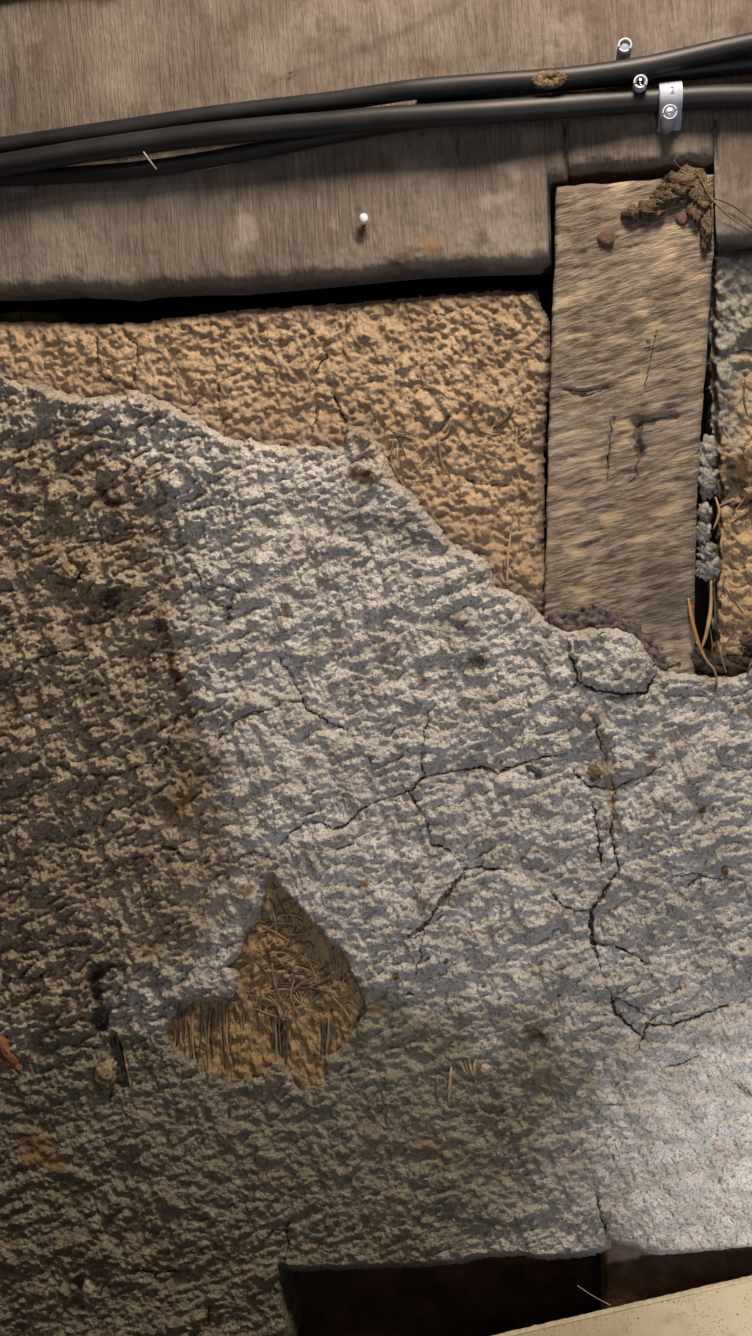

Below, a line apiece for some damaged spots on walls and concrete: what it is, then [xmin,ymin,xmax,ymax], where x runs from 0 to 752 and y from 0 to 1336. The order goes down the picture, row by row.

spalling [0,290,673,671]
spalling [704,250,752,657]
spalling [167,877,365,1091]
crack [114,635,726,1050]
crack [671,872,742,882]